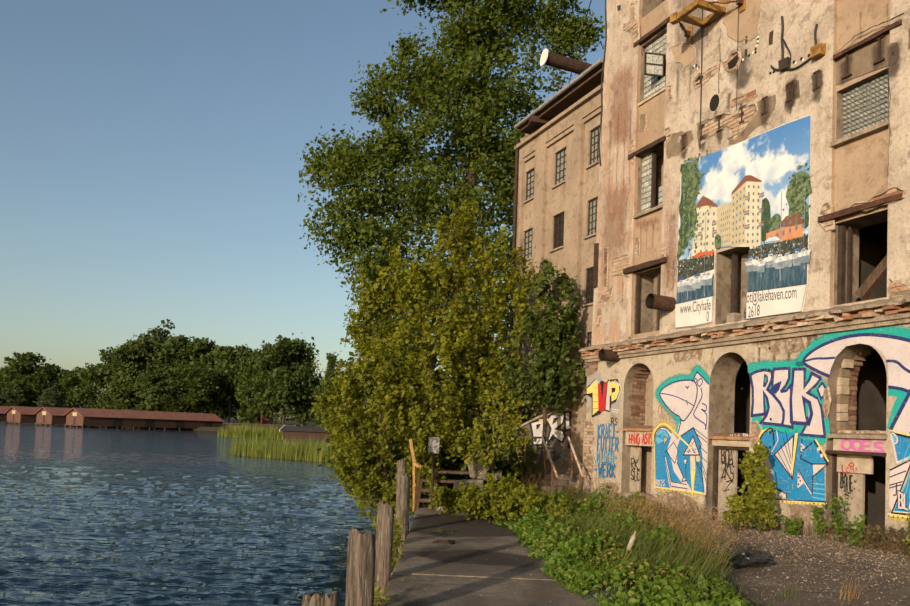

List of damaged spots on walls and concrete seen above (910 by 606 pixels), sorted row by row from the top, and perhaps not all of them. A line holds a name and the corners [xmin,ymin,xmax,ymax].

peeling [693,0,774,90]
spalling [665,89,758,159]
spalling [596,237,640,328]
peeling [767,336,806,356]
spalling [583,418,620,501]